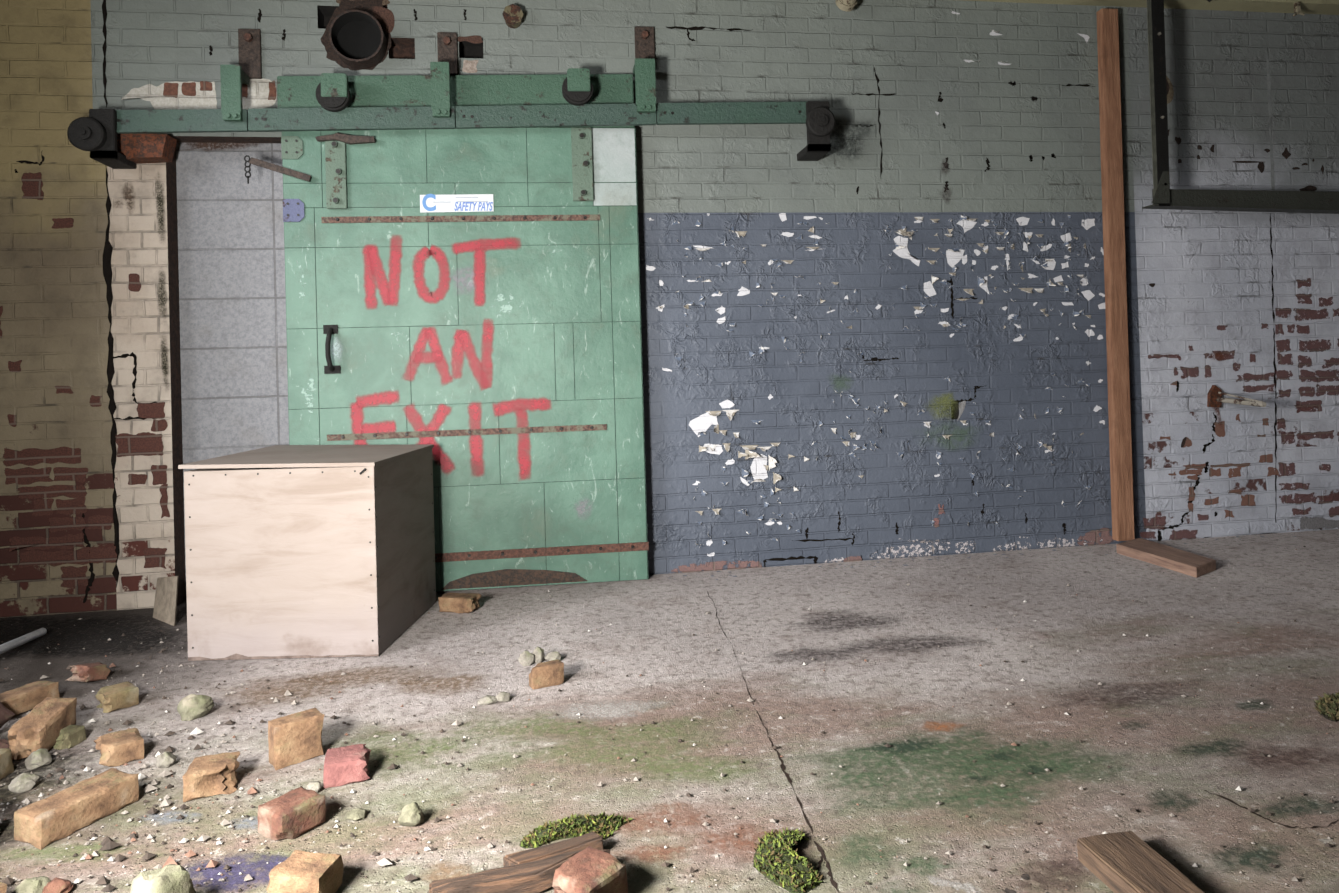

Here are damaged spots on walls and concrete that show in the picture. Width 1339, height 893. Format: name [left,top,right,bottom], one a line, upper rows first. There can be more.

peeling [121,81,217,110]
peeling [242,78,277,110]
crack [851,67,895,194]
peeling [646,213,858,341]
peeling [884,215,1105,341]
flaking render [115,402,170,518]
peeling [671,390,951,573]
crack [1158,412,1217,541]
flaking render [1140,278,1339,540]
crack [1253,213,1277,535]
flaking render [143,548,167,569]
crack [707,591,839,893]